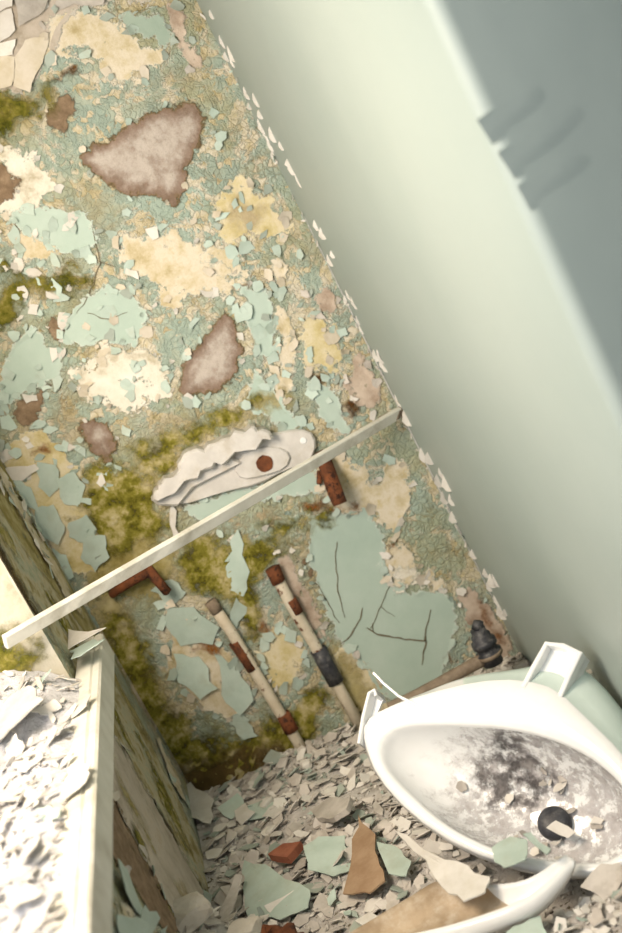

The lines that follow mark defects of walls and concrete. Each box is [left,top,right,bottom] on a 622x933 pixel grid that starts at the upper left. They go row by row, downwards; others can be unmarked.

peeling [0,0,203,95]
peeling [0,36,514,714]
damp [0,459,74,606]
damp [86,532,159,584]
damp [71,551,176,645]
crack [318,546,431,664]
peeling [0,685,43,740]
peeling [71,693,91,718]
peeling [151,579,258,740]
damp [181,744,285,791]
spalling [113,735,214,933]
peeling [219,874,242,920]